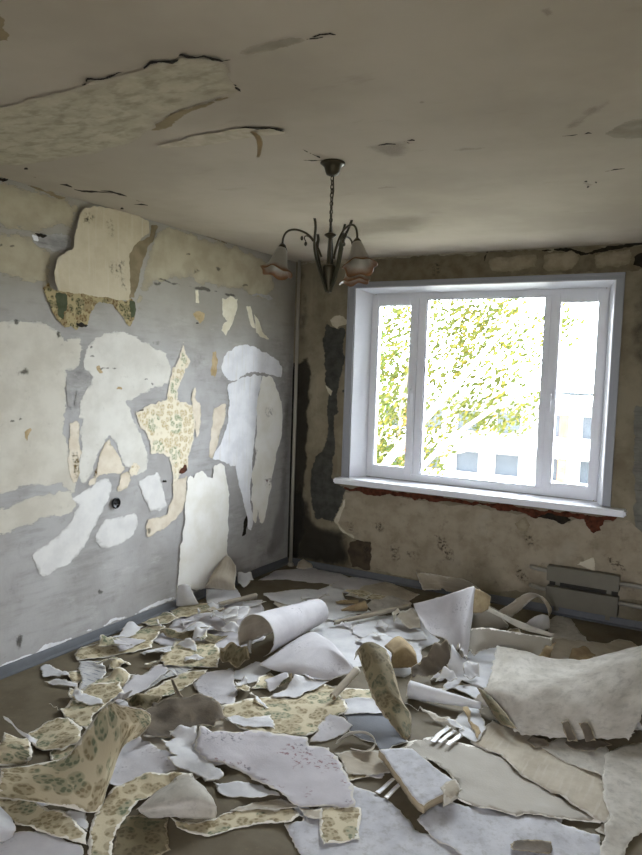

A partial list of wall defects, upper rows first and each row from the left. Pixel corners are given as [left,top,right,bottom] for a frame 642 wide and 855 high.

peeling [0,54,241,165]
peeling [157,127,285,157]
flaking render [32,233,71,253]
crack [542,243,642,256]
peeling [246,306,269,339]
flaking render [66,368,90,407]
peeling [191,387,201,437]
peeling [310,315,617,533]
peeling [251,376,283,523]
peeling [146,476,188,537]